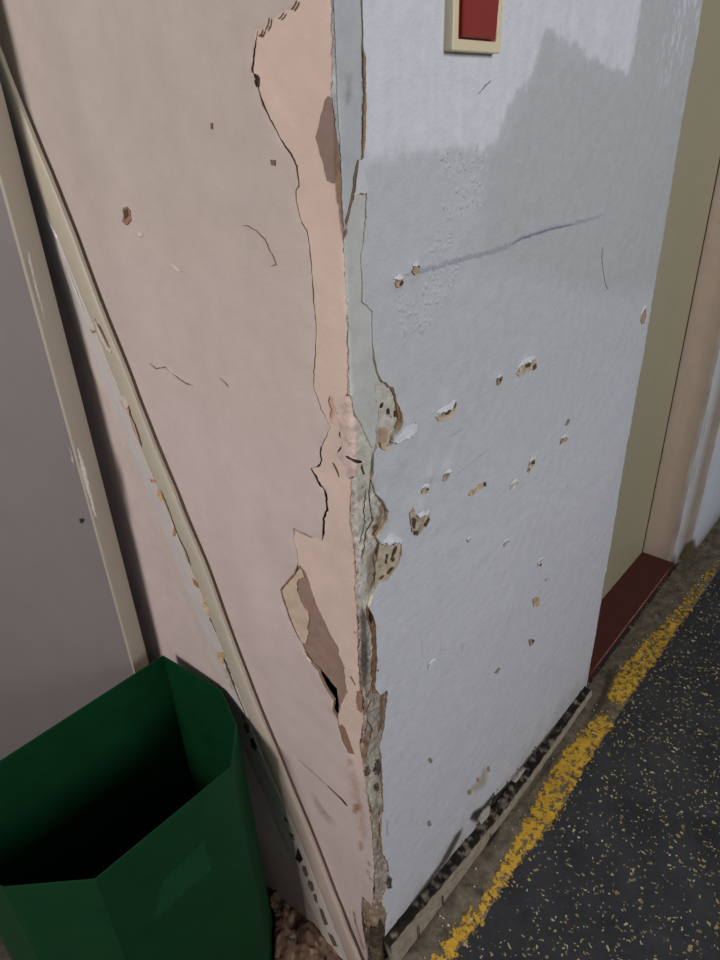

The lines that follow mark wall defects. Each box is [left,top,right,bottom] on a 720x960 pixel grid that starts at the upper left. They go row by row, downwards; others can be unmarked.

peeling [122,206,132,225]
crack [242,225,276,266]
crack [252,0,341,540]
crack [151,364,193,386]
peeling [516,356,537,376]
peeling [435,400,457,421]
flaking render [280,0,430,960]